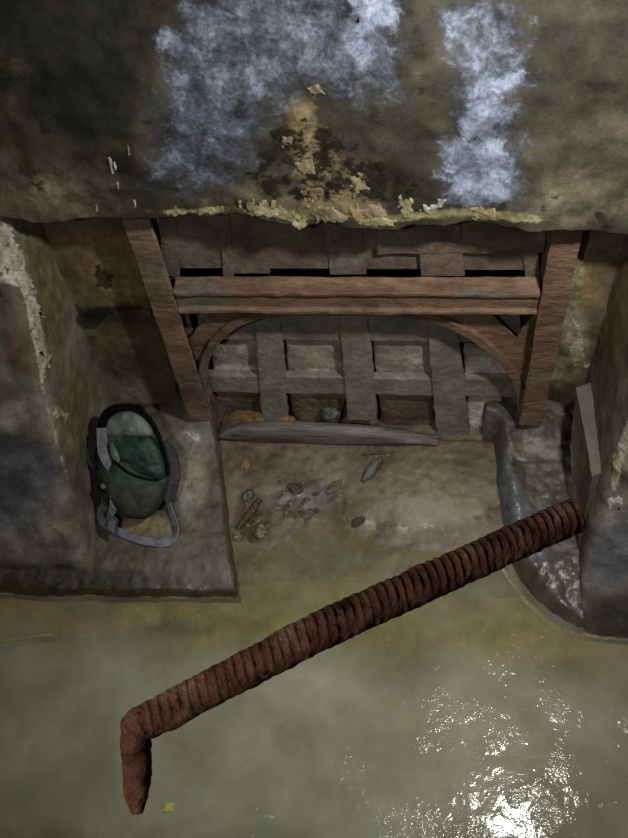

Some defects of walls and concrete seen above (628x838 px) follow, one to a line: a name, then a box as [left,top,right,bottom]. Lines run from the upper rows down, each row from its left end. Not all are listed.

water stain [151,0,423,203]
peeling [145,83,554,230]
water stain [420,0,524,214]